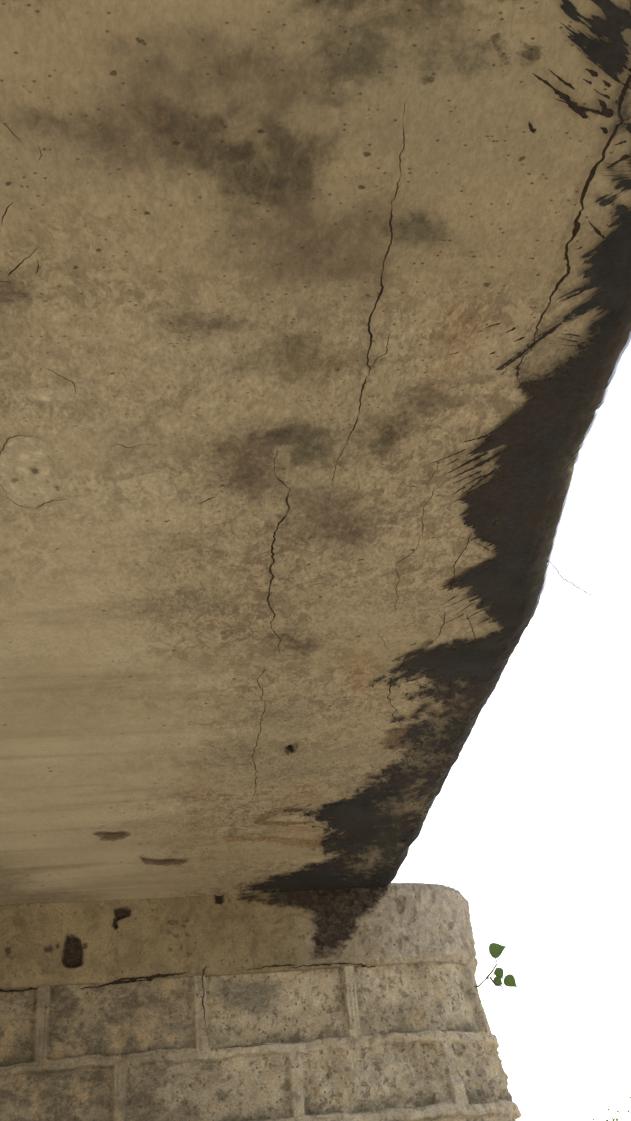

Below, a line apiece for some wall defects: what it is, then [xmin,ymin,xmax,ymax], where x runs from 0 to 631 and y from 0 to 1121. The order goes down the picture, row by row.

leakage [218,131,309,198]
crack [320,105,405,502]
crack [517,75,631,384]
leakage [237,0,631,957]
crack [204,432,290,850]
crack [0,984,42,992]
crack [81,966,206,1023]